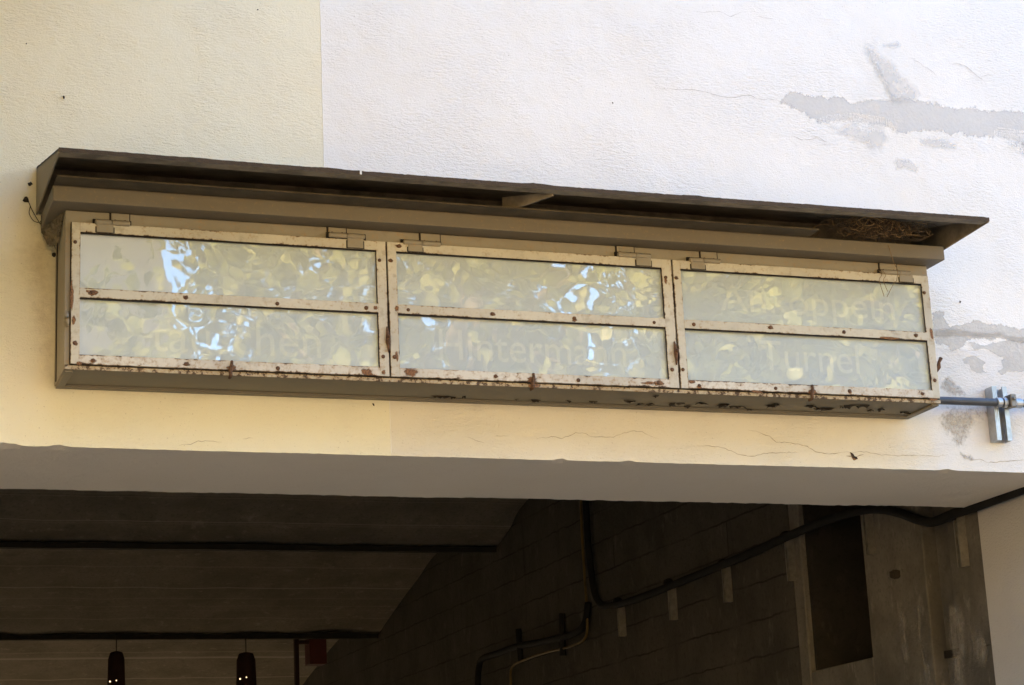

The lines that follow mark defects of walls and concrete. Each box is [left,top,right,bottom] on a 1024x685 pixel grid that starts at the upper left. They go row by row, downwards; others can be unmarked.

peeling [782,92,1024,142]
peeling [964,341,1024,374]